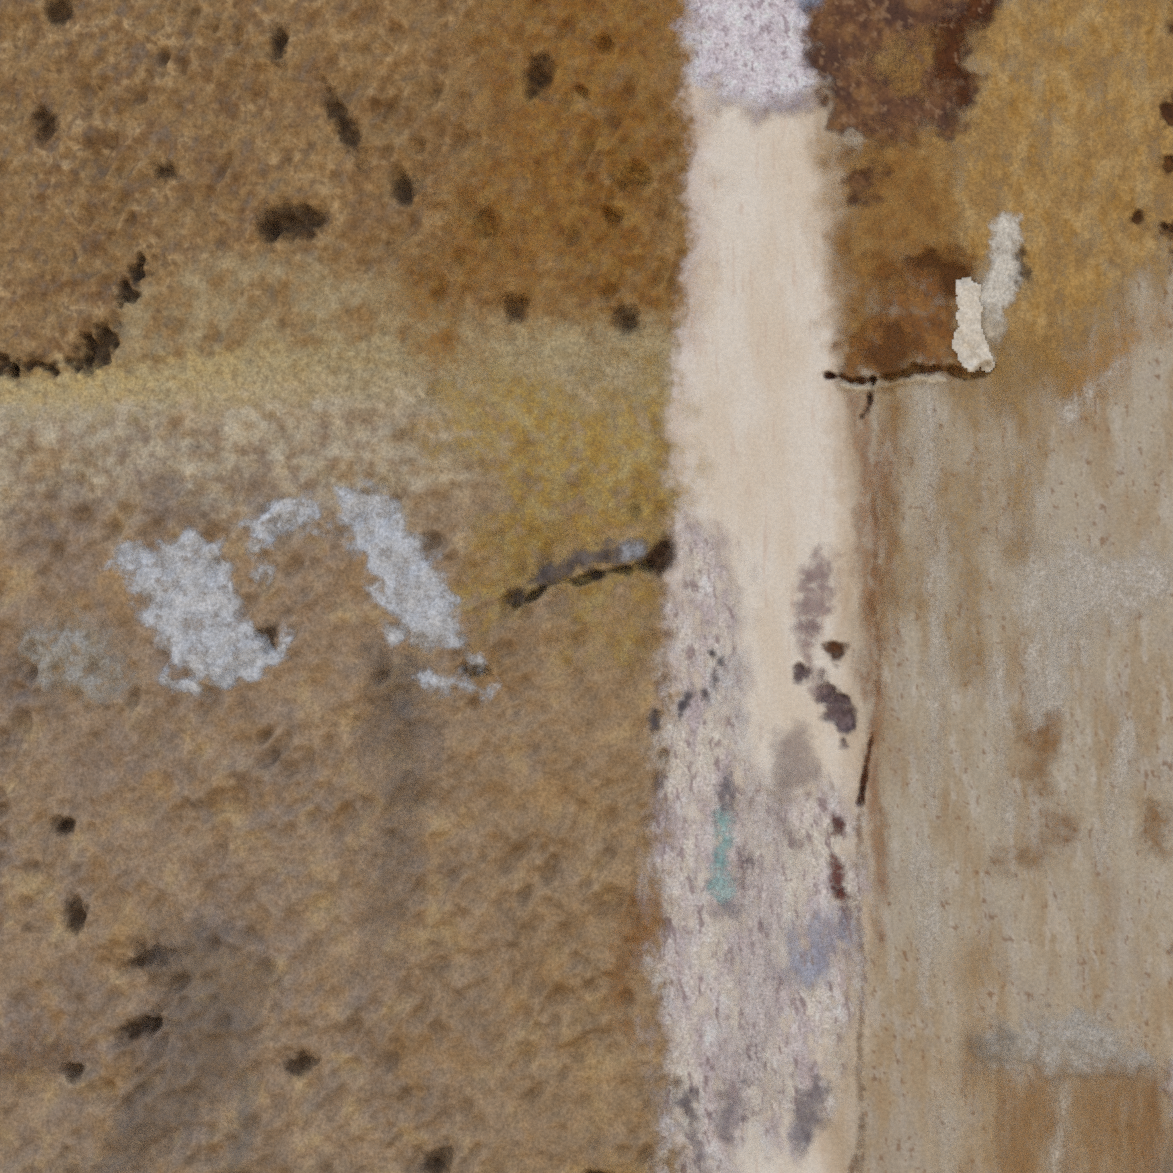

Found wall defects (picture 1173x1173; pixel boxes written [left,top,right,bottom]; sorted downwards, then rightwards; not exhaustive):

spalling [1160,103,1173,126]
spalling [1163,156,1173,173]
spalling [680,0,1030,384]
leakage [837,0,1173,421]
crack [825,363,992,405]
crack [511,537,675,608]
peeling [385,625,406,645]
leakage [1012,457,1082,789]
peeling [468,655,484,675]